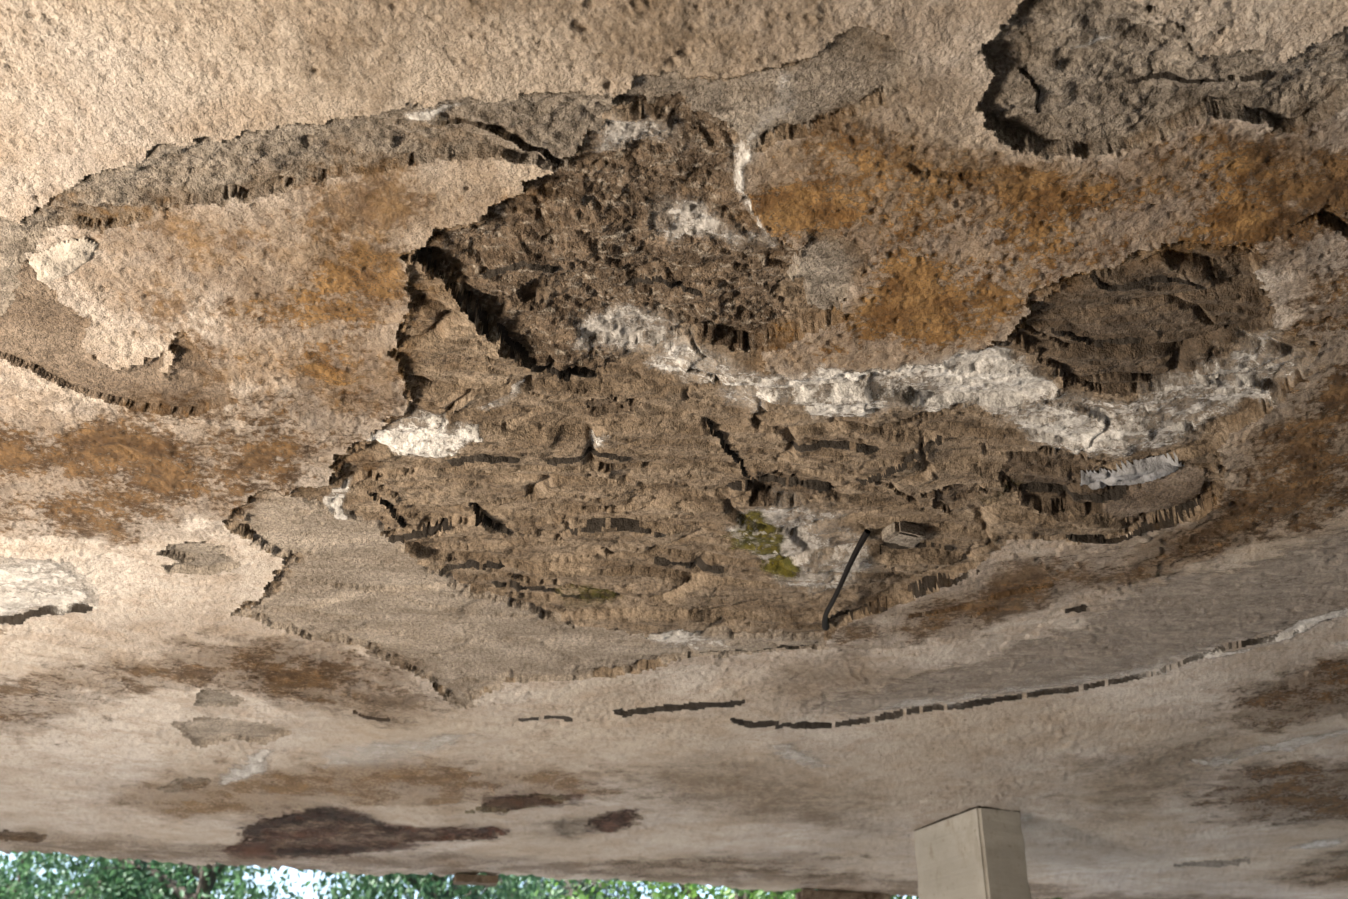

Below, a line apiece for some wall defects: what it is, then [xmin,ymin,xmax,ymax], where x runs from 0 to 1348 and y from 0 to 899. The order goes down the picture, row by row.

leakage [579,0,741,54]
spalling [975,0,1348,160]
spalling [0,25,1321,709]
leakage [578,106,1348,651]
crack [518,714,573,722]
crack [612,618,1332,729]
crack [909,583,1088,619]
leakage [1204,648,1251,659]